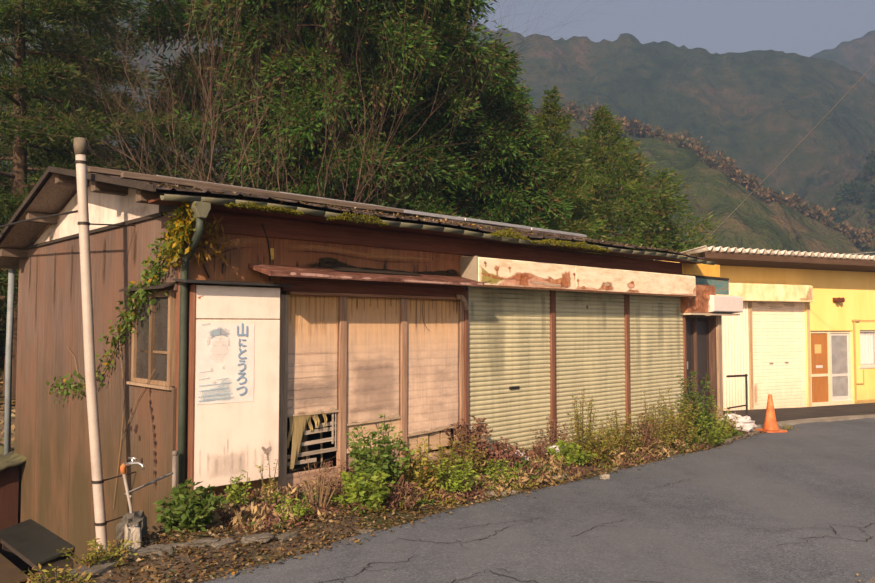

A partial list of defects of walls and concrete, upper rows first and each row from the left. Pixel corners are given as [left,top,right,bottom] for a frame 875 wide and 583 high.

crack [316,518,538,583]